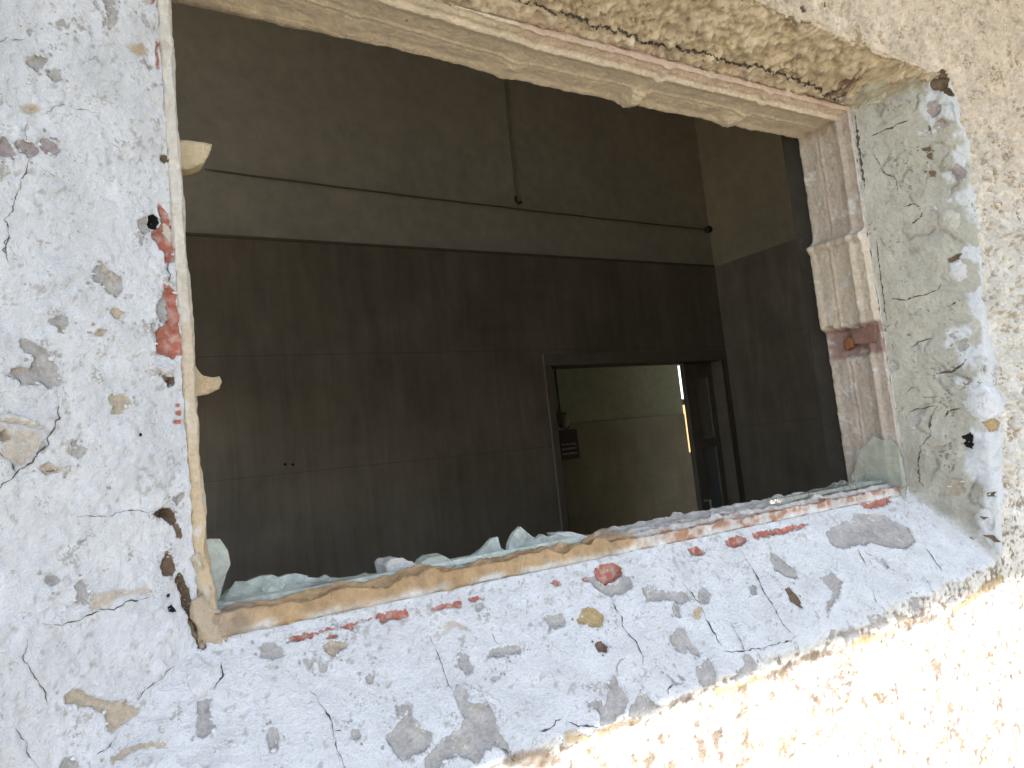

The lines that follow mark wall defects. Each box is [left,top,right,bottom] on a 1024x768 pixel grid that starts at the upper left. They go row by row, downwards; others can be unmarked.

crack [516,0,923,224]
spalling [917,69,967,180]
crack [2,104,100,260]
flaking render [137,203,175,264]
flaking render [142,283,183,359]
crack [876,239,956,320]
crack [0,390,61,488]
peeling [826,496,915,571]
crack [49,597,148,626]
peeling [582,563,718,693]
crack [687,558,796,653]
peeling [381,646,512,768]